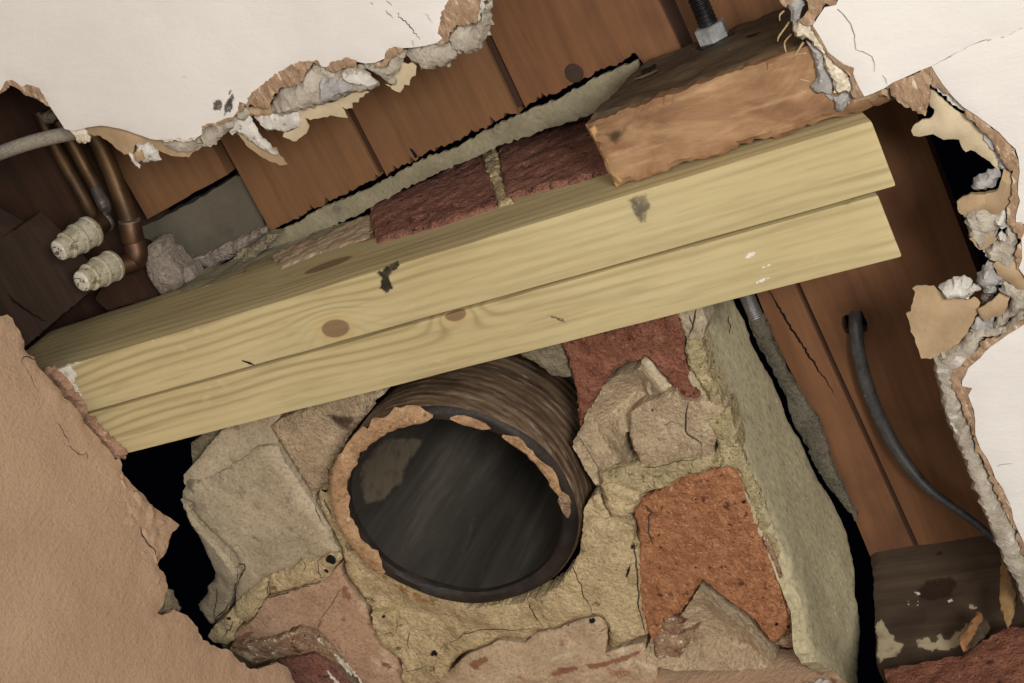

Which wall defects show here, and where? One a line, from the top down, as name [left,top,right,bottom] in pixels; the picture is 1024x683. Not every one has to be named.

crack [838,9,887,83]
spalling [980,284,999,303]
spalling [43,365,128,459]
peeling [120,474,167,563]